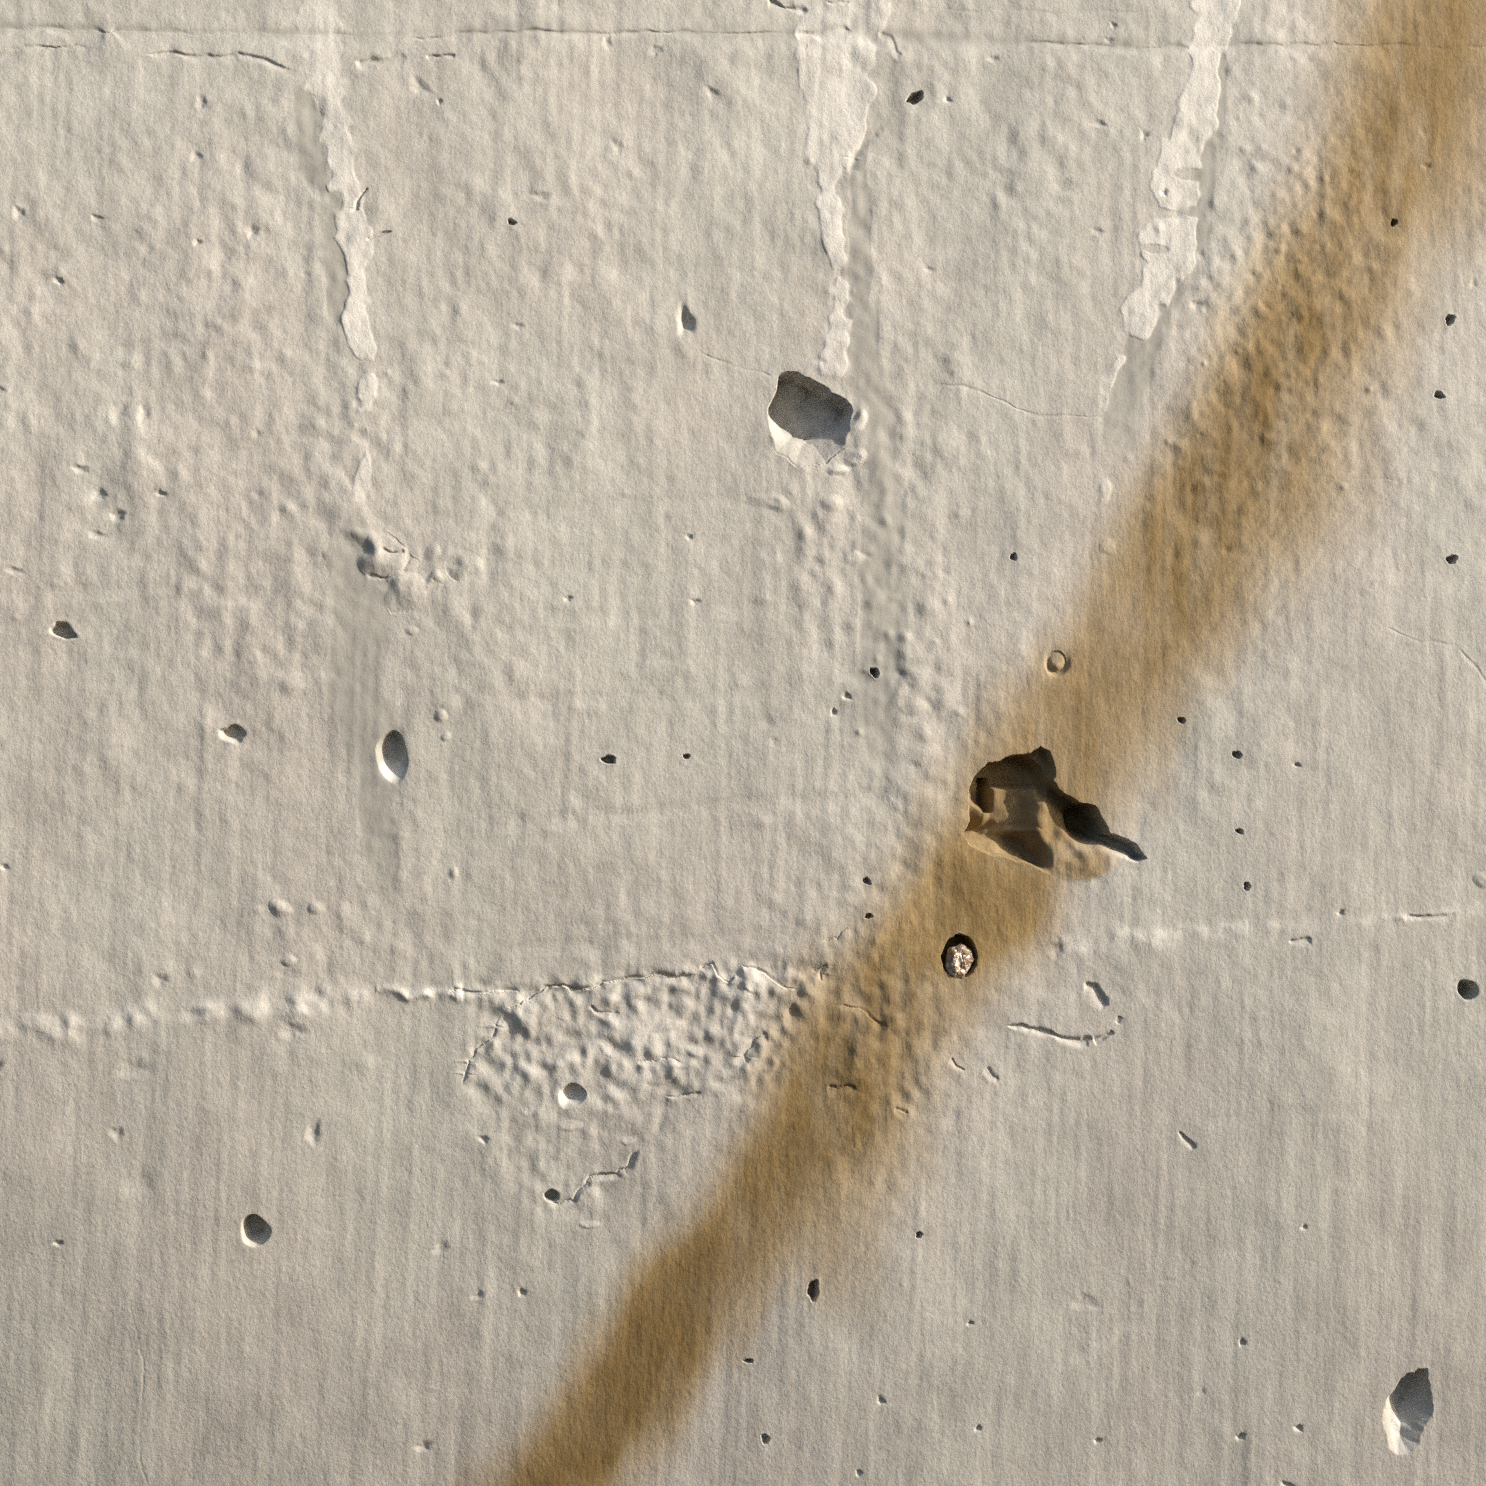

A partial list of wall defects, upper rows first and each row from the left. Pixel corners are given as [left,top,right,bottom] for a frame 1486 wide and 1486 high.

leakage [297,0,344,28]
crack [765,0,808,16]
leakage [1097,0,1242,474]
leakage [290,48,407,894]
spalling [746,492,798,515]
spalling [766,370,870,513]
leakage [792,0,911,803]
corrosion [441,0,1486,1486]
spalling [963,745,1149,885]
crack [949,1057,1000,1085]
crack [1004,981,1124,1049]
spalling [1380,1366,1436,1458]